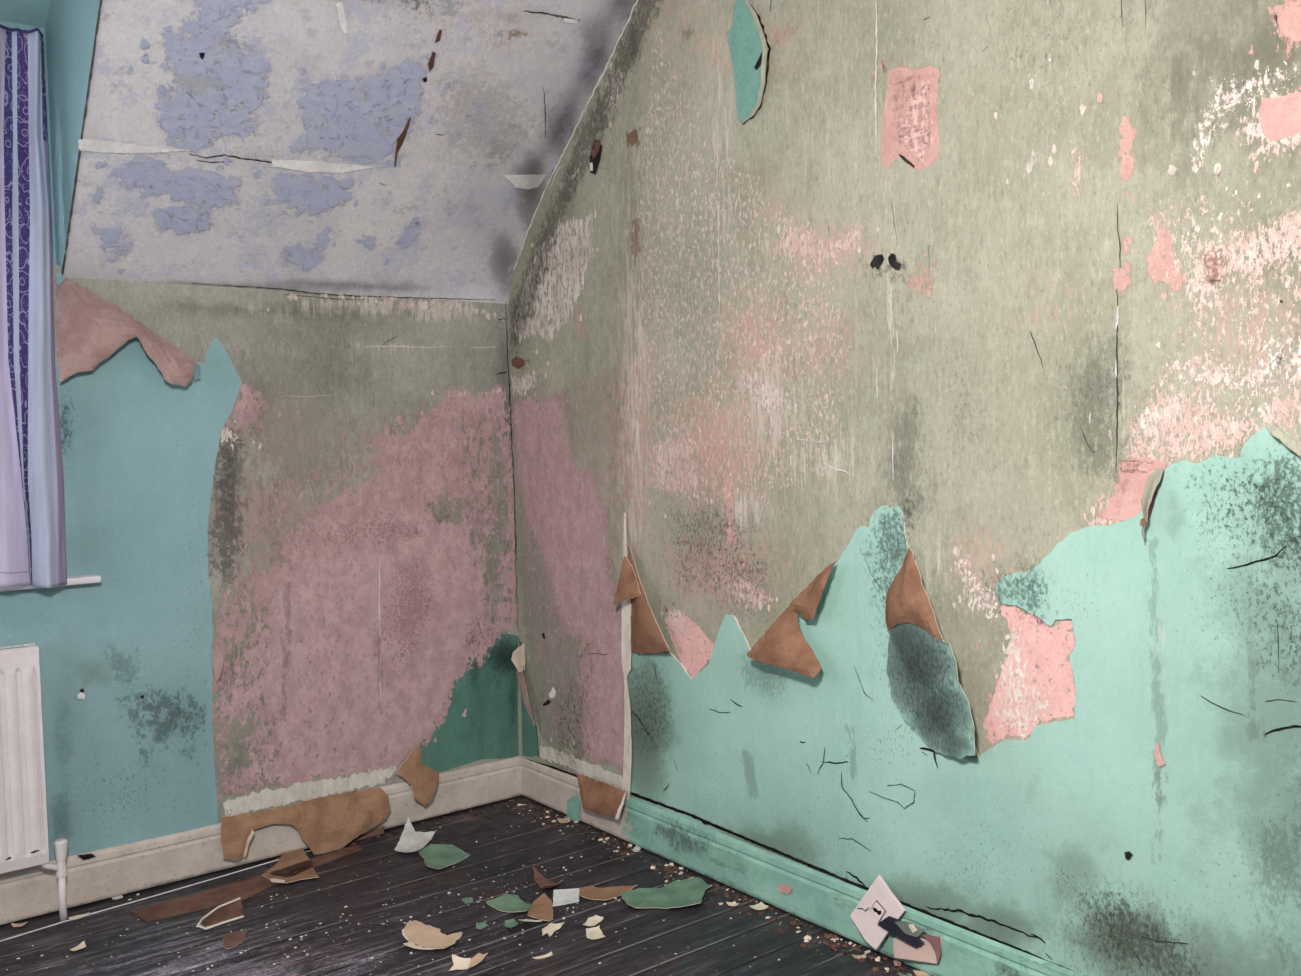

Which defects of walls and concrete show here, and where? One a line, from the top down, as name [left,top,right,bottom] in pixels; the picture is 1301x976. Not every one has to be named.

crack [190,154,272,163]
crack [514,0,638,270]
peeling [78,0,625,816]
crack [192,283,518,628]
peeling [636,19,940,612]
peeling [1078,0,1301,526]
peeling [658,595,714,678]
mould [886,623,975,759]
peeling [949,540,1076,745]
crack [1201,627,1301,737]
crack [630,741,915,911]
crack [899,901,1086,976]